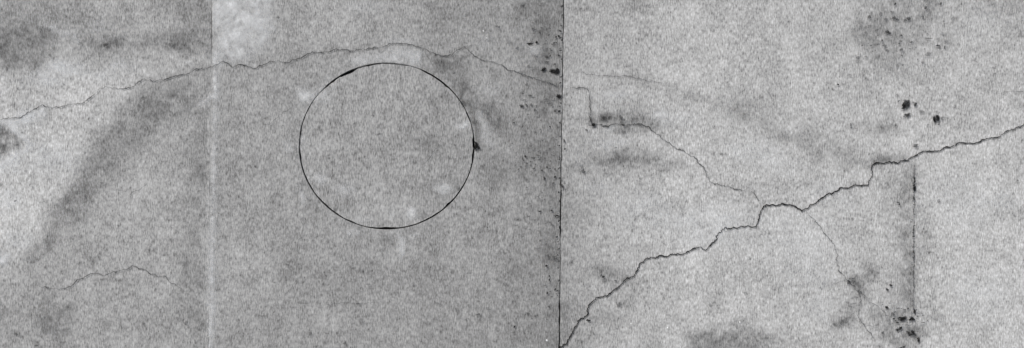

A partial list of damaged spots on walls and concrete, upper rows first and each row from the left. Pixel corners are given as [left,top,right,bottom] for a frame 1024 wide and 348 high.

crack [6,43,532,119]
crack [553,84,1024,348]